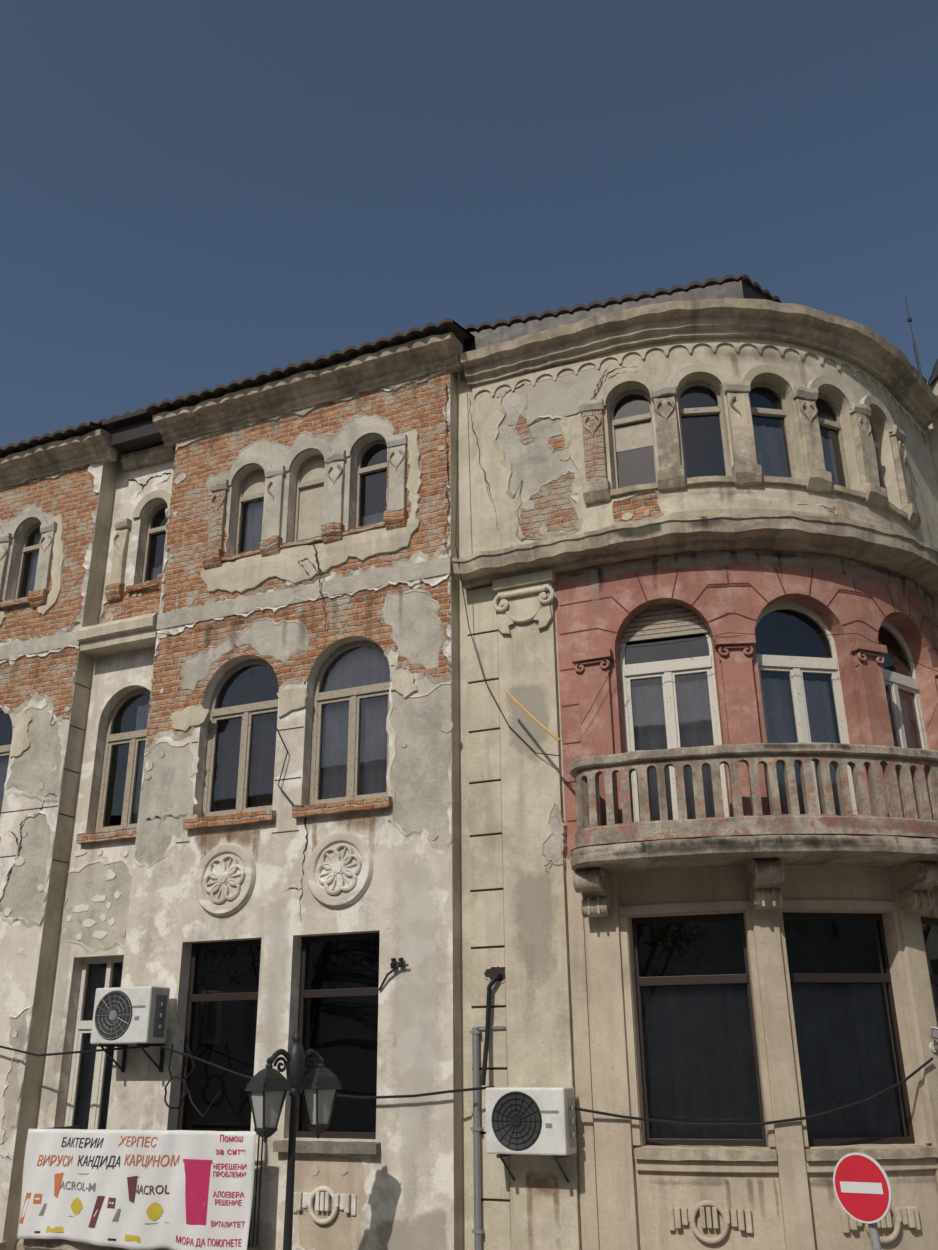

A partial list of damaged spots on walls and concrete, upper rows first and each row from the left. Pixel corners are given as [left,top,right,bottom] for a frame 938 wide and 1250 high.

crack [440,383,499,554]
spalling [492,367,603,542]
spalling [0,464,100,928]
spalling [42,370,454,1110]
crack [0,793,56,903]
crack [283,799,308,917]